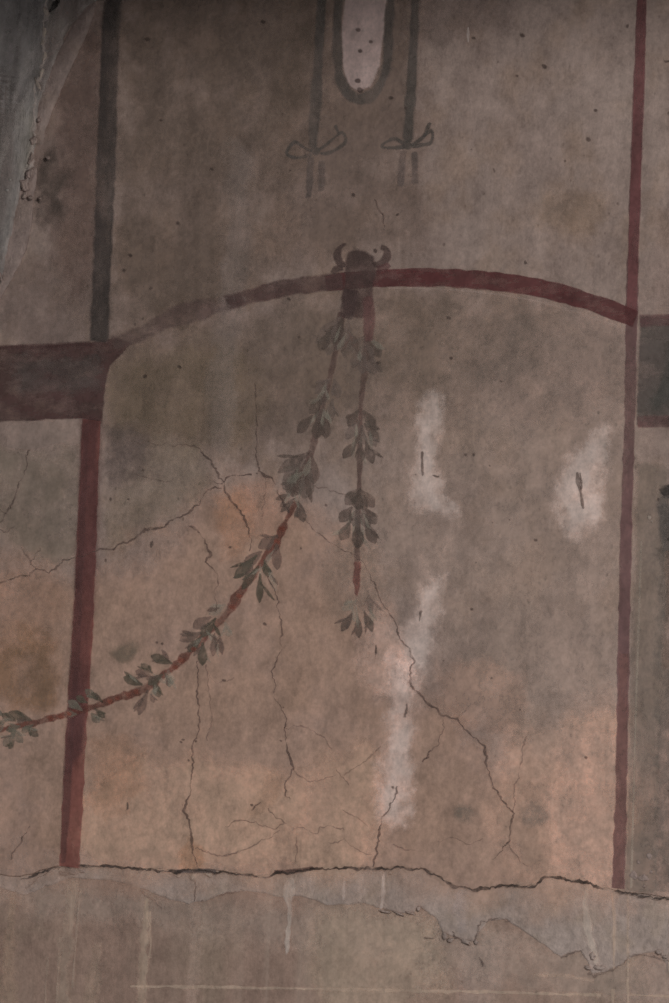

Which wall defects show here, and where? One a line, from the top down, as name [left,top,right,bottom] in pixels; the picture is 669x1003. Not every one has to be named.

crack [0,384,669,908]
leakage [0,349,669,1003]
crack [424,918,510,967]
crack [561,950,669,978]